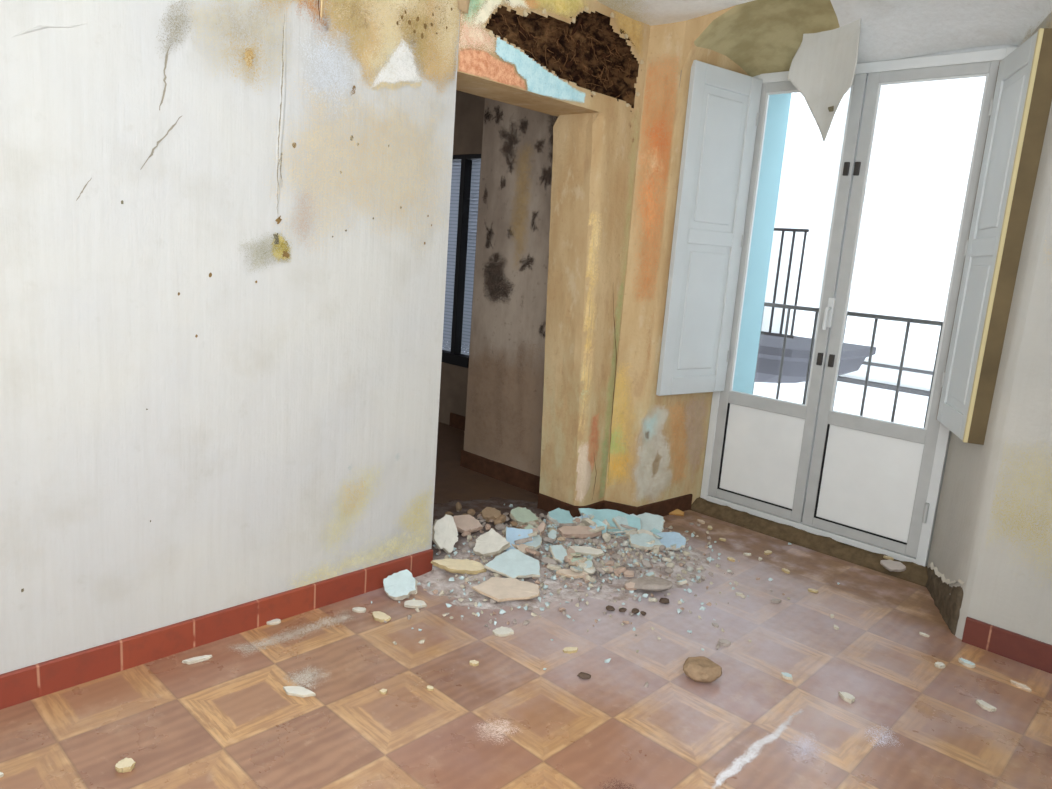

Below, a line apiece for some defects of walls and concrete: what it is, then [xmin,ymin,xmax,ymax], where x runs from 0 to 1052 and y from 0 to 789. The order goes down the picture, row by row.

peeling [372,38,423,91]
flaking render [458,0,644,112]
peeling [787,19,861,142]
crack [140,116,182,170]
leakage [482,106,557,306]
flaking render [925,562,964,635]